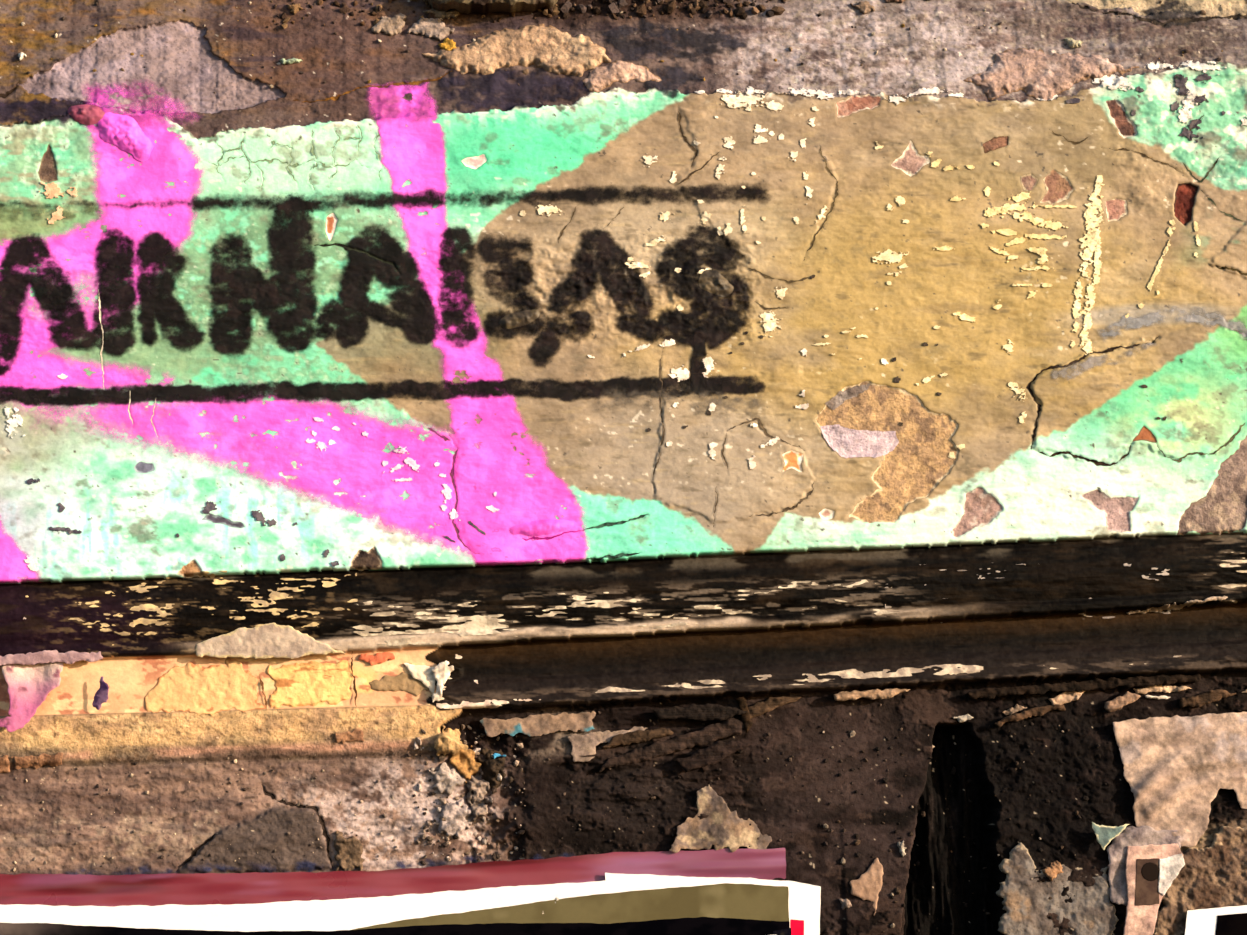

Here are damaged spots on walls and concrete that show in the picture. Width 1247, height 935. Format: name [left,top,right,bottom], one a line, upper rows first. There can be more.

spalling [19,20,286,114]
spalling [695,48,1227,205]
crack [1049,129,1242,221]
spalling [1174,183,1198,225]
crack [1210,265,1247,275]
spalling [795,372,965,523]
spalling [952,487,1003,537]
crack [1026,336,1245,466]
spalling [1177,436,1247,535]
peeling [0,547,898,732]
spalling [792,664,983,685]
peeling [850,858,884,916]